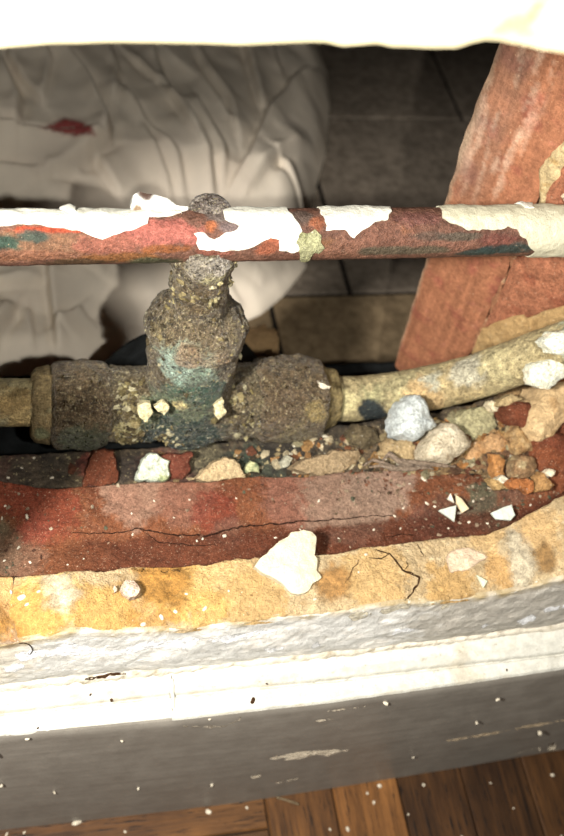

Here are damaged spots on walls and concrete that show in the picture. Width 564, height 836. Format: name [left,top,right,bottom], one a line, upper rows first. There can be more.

peeling [0,204,182,240]
peeling [194,206,302,253]
peeling [317,205,392,238]
peeling [436,201,564,258]
peeling [137,399,169,422]
peeling [213,397,227,420]
spalling [493,401,531,428]
crack [73,515,424,600]
spalling [0,422,564,672]